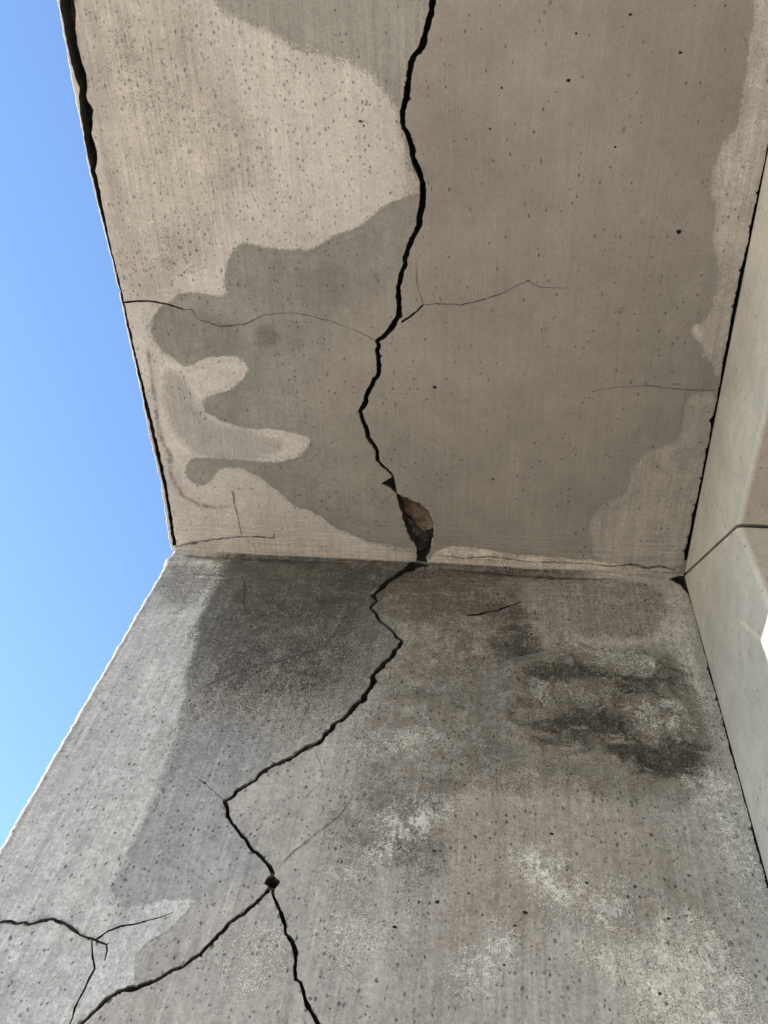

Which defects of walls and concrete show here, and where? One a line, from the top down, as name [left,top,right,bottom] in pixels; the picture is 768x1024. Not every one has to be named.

crack [122,300,257,327]
crack [0,560,429,1024]
crack [176,494,343,613]
spalling [396,493,434,563]
crack [296,0,551,494]
water stain [106,193,768,1024]